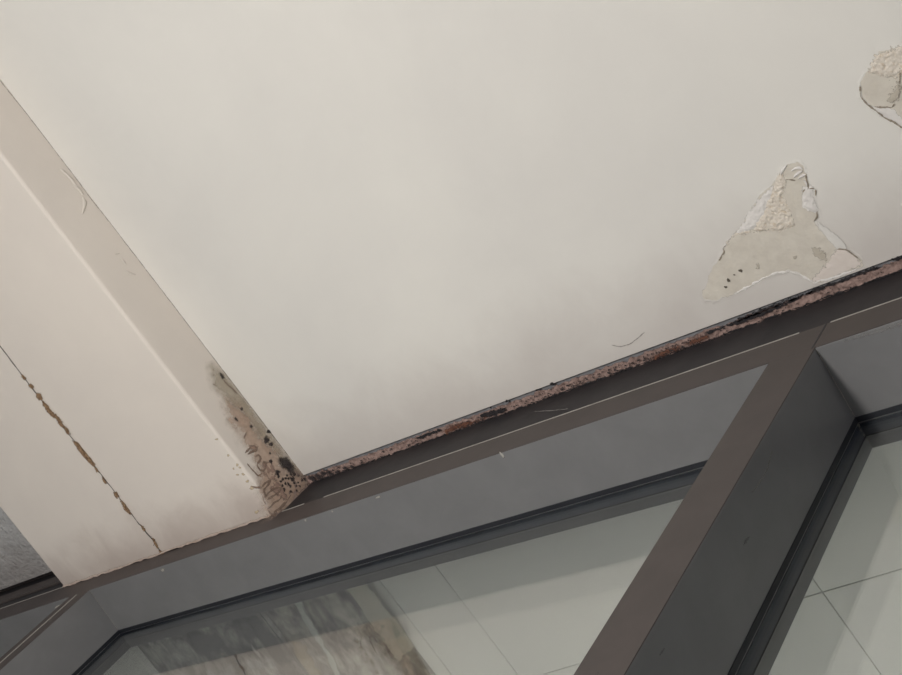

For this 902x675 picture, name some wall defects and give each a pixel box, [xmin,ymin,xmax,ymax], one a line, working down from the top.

peeling [855,42,902,172]
peeling [698,157,867,306]
water stain [452,323,734,428]
crack [97,469,161,551]
water stain [214,373,369,517]